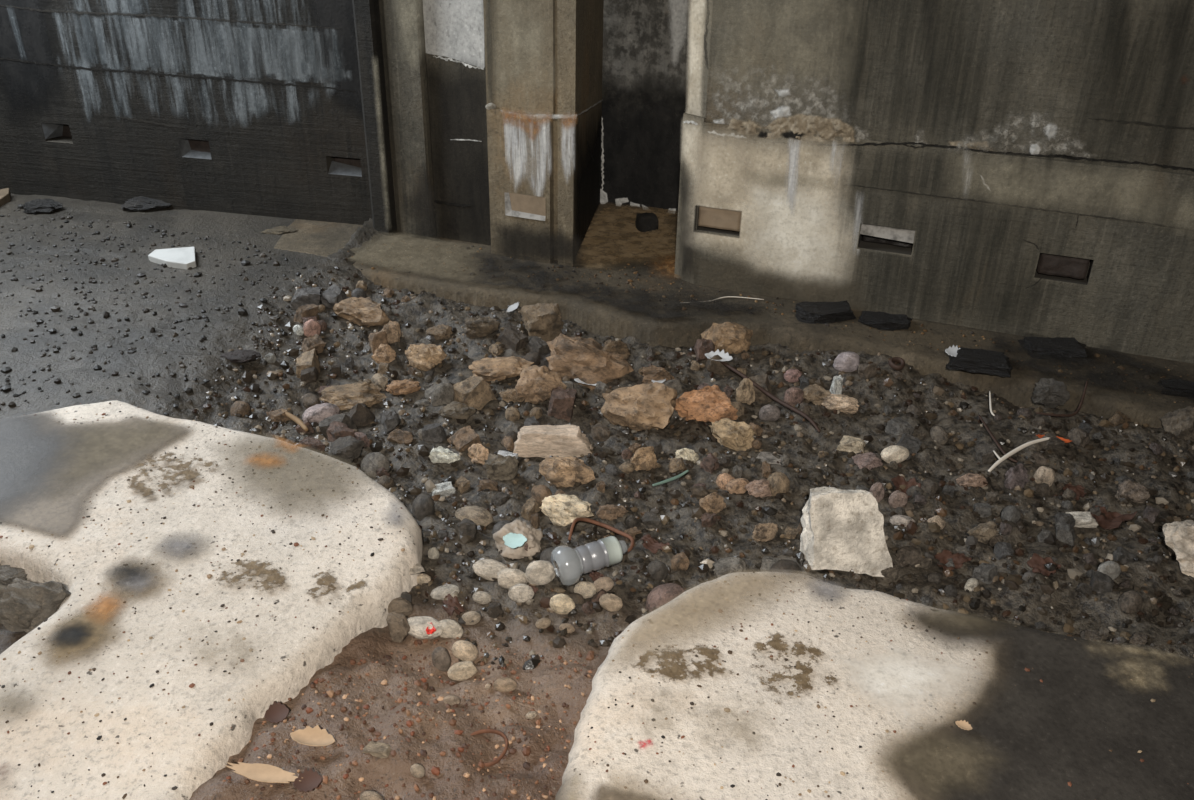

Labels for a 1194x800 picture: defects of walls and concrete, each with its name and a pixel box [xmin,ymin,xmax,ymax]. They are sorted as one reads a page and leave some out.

crack [703,0,711,69]
leakage [502,110,576,196]
spalling [714,89,868,143]
leakage [668,0,981,311]
crack [767,142,1194,231]
crack [1089,118,1194,130]
leakage [872,153,1030,324]